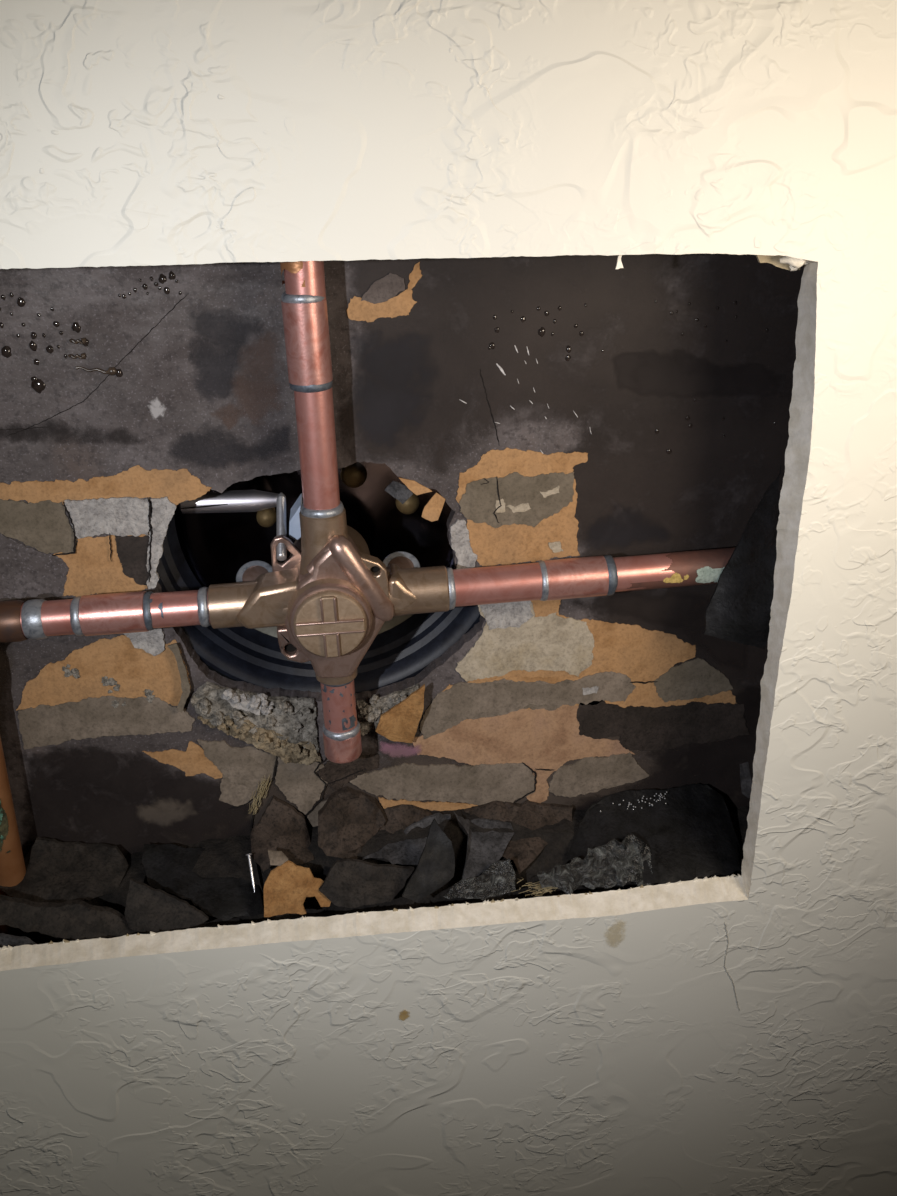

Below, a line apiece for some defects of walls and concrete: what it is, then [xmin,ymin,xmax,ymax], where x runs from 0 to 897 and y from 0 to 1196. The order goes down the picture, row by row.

leakage [68,338,117,376]
leakage [339,253,804,558]
spalling [191,682,321,765]
spalling [357,683,419,736]
peeling [264,849,331,917]
crack [724,923,740,1010]